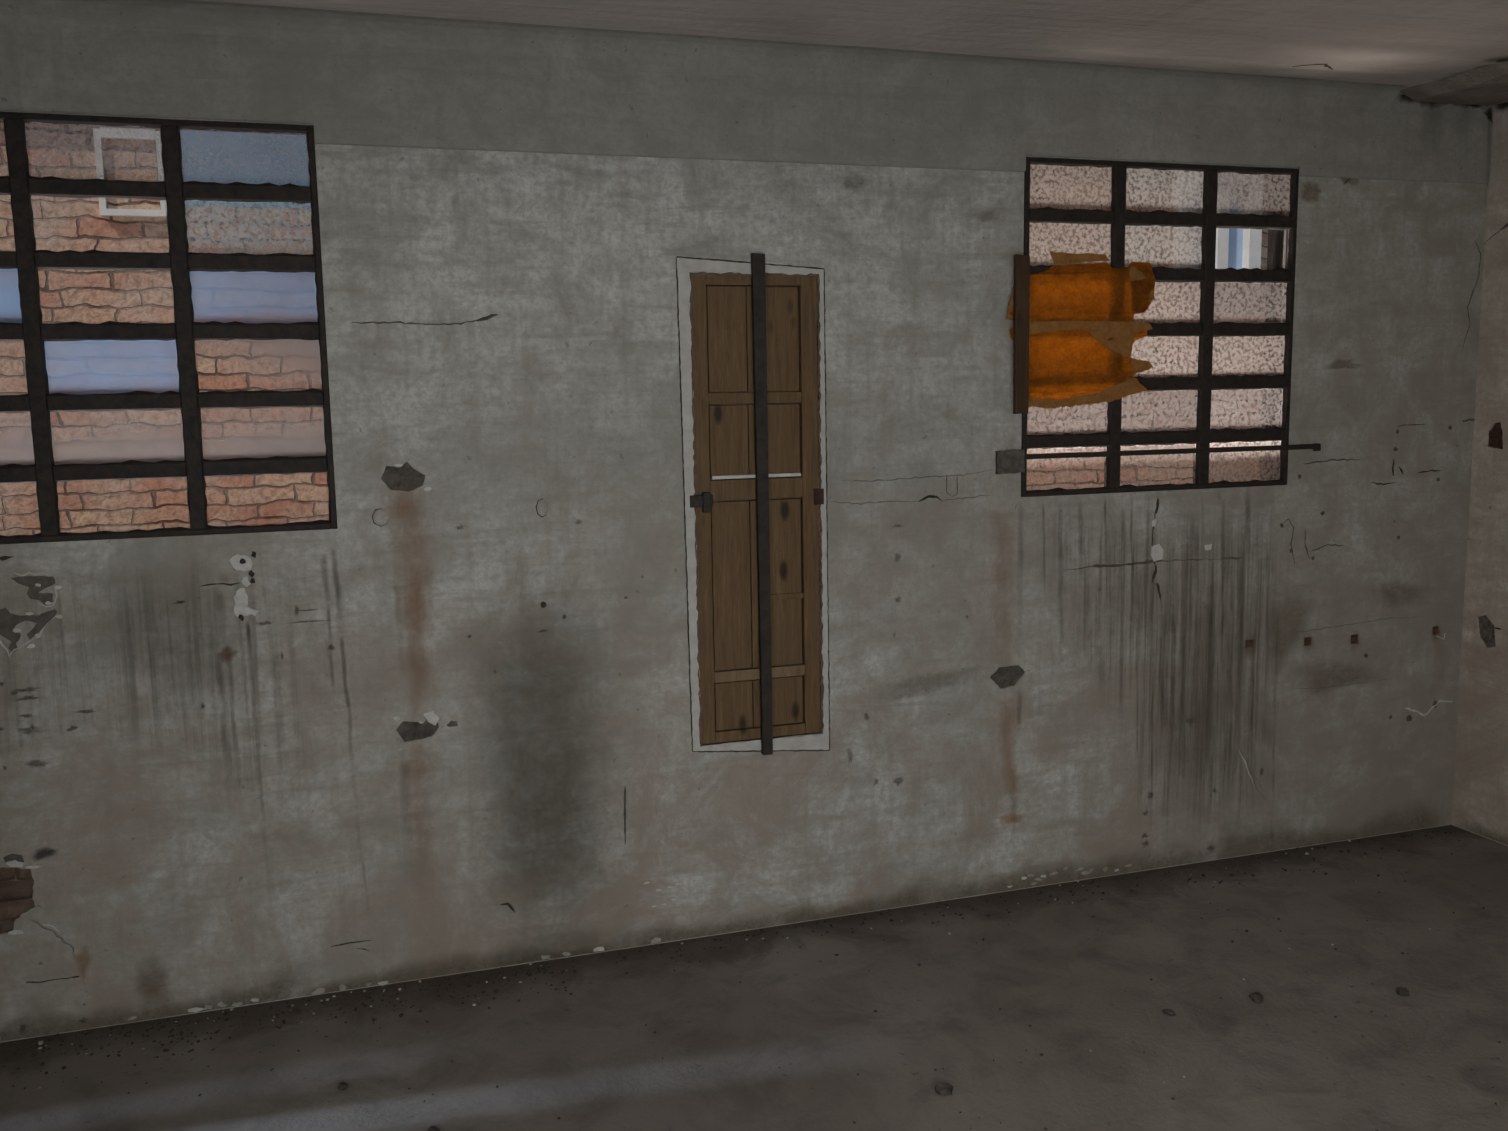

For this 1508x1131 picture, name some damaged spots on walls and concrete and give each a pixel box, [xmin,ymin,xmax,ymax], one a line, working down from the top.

crack [1463,223,1508,347]
spalling [378,457,432,492]
peeling [0,556,63,657]
spalling [990,663,1034,688]
spalling [393,710,458,751]
spalling [0,850,77,958]